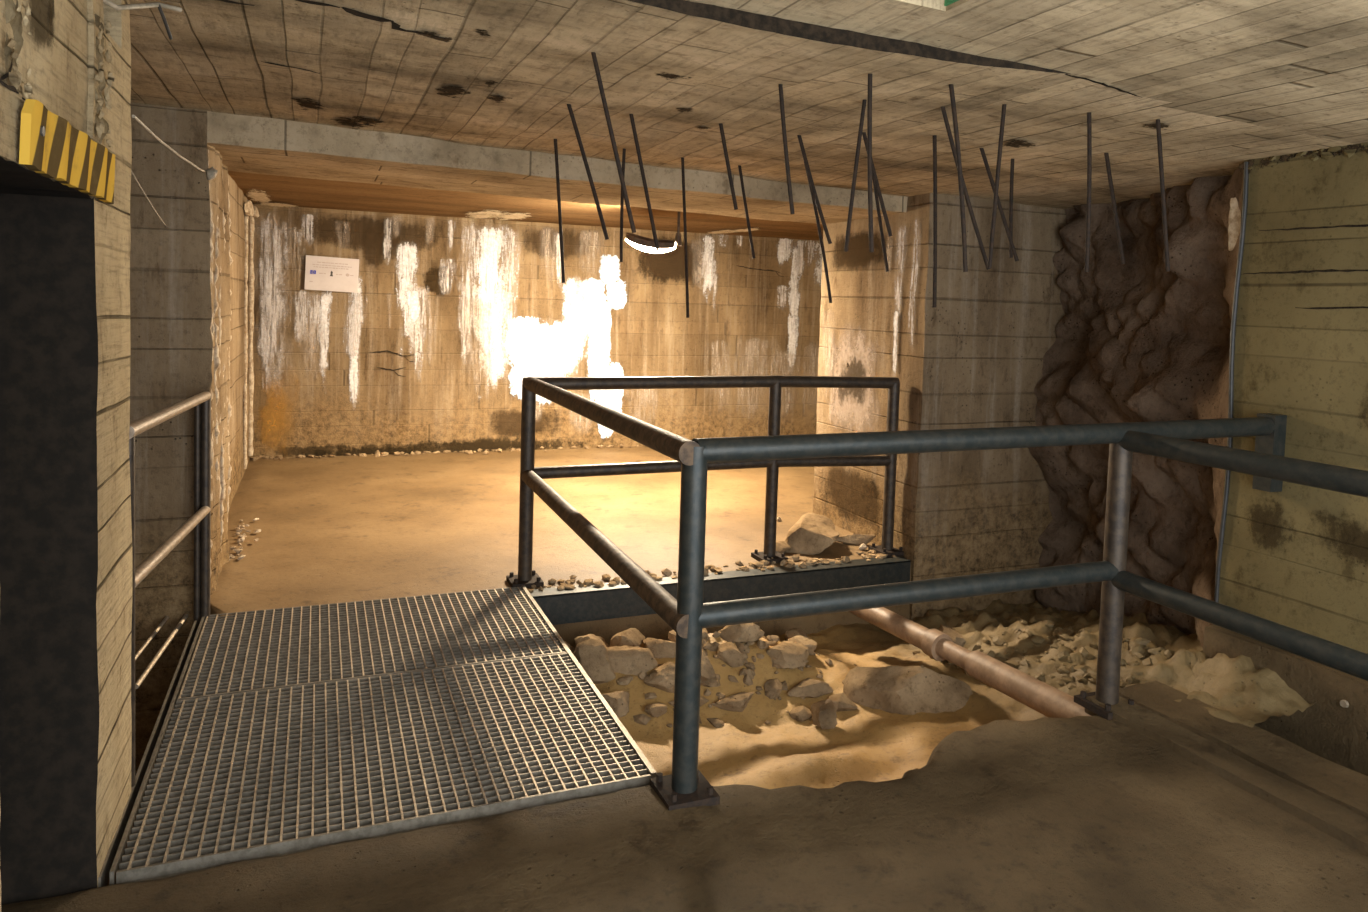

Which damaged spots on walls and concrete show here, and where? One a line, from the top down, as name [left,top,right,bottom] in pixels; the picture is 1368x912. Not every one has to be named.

spalling [4,0,33,99]
spalling [94,14,115,147]
leakage [208,150,657,552]
spalling [554,139,565,283]
spalling [567,52,660,262]
spalling [681,157,689,318]
leakage [639,228,759,293]
spalling [676,108,755,258]
leakage [712,220,919,432]
spalling [778,73,893,303]
spalling [932,84,1036,307]